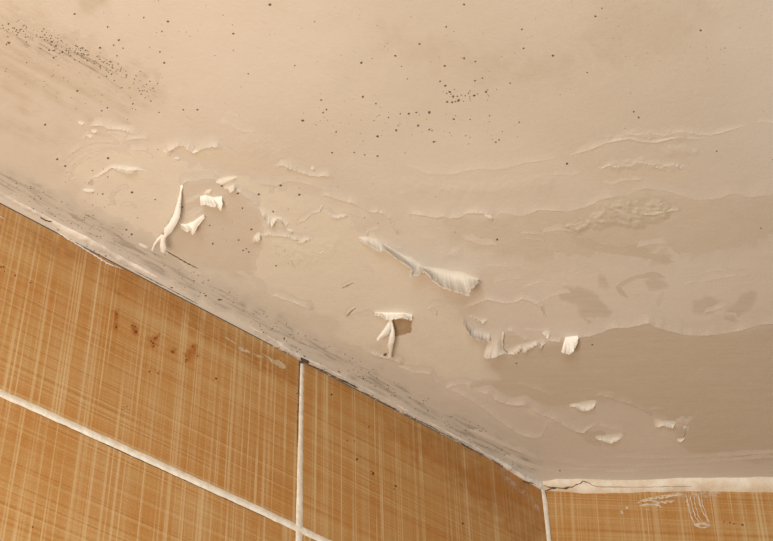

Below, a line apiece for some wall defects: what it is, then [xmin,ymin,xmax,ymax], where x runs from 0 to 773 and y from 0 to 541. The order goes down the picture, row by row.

peeling [83,164,146,192]
leakage [57,229,122,269]
peeling [139,170,264,282]
peeling [359,235,773,359]
leakage [225,337,286,369]
peeling [344,305,412,366]
peeling [583,420,628,446]
peeling [569,391,695,442]